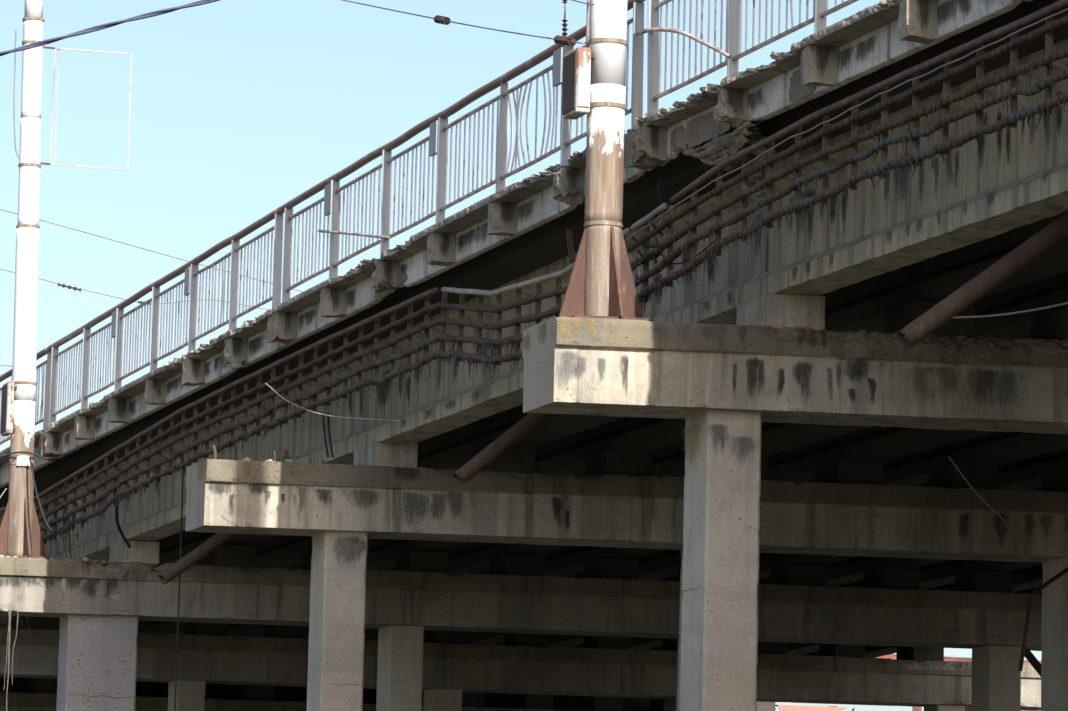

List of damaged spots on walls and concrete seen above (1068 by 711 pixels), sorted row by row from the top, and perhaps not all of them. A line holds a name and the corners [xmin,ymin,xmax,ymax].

damp [729,88,763,114]
spalling [673,111,763,172]
damp [977,114,1010,161]
damp [884,138,958,195]
spalling [844,331,995,364]
spalling [1014,338,1068,354]
damp [733,358,764,394]
damp [778,362,811,392]
damp [827,360,876,400]
damp [712,424,753,458]
damp [316,489,329,503]
damp [403,492,462,522]